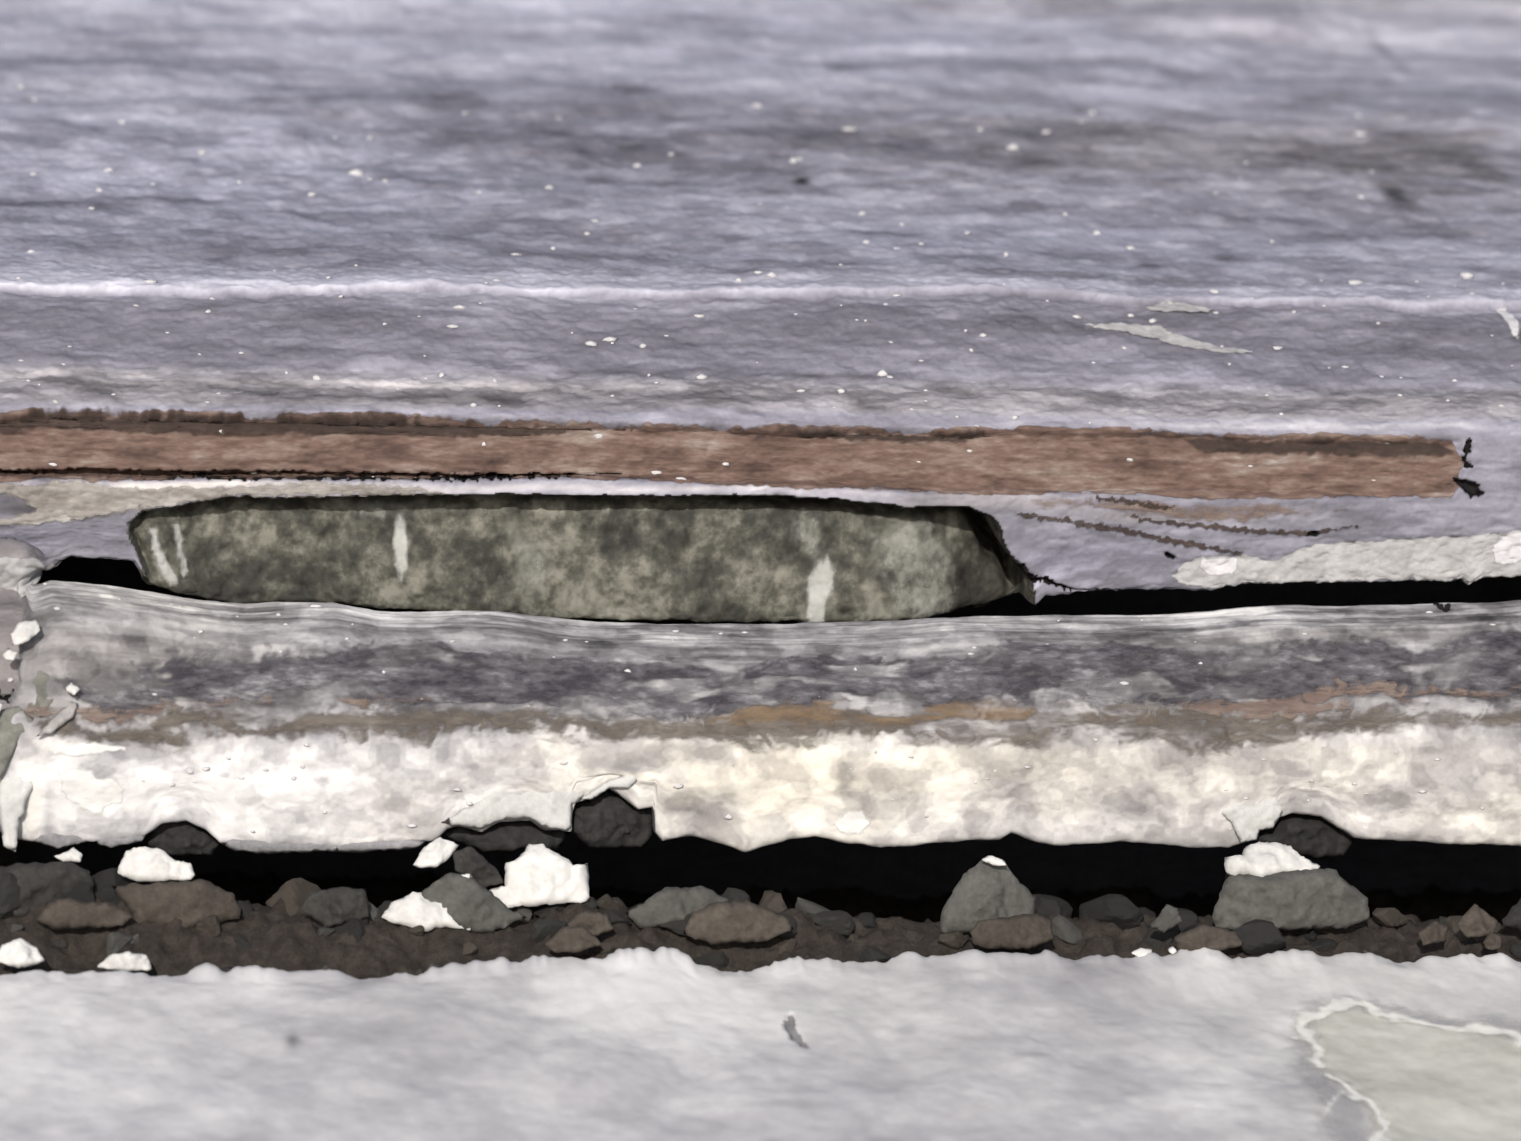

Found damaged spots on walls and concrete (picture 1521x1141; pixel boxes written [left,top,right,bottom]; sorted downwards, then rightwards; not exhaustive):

crack [142,471,600,482]
spalling [1165,530,1521,588]